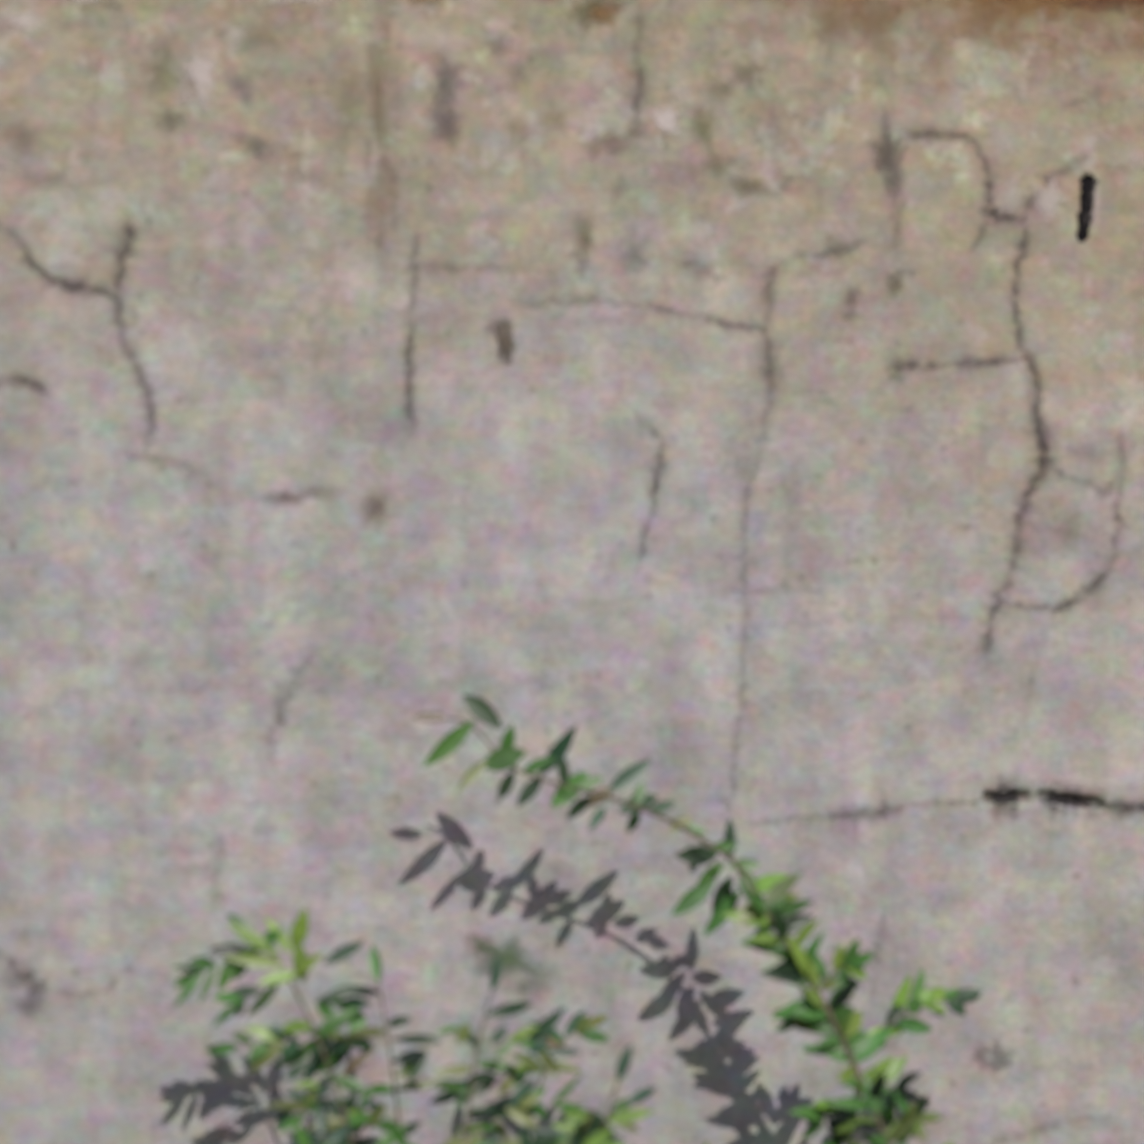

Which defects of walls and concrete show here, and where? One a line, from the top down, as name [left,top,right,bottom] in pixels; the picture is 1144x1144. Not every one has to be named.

crack [63,271,122,313]
crack [1014,240,1027,339]
crack [1015,362,1048,551]
crack [988,786,1020,808]
crack [1047,793,1144,814]